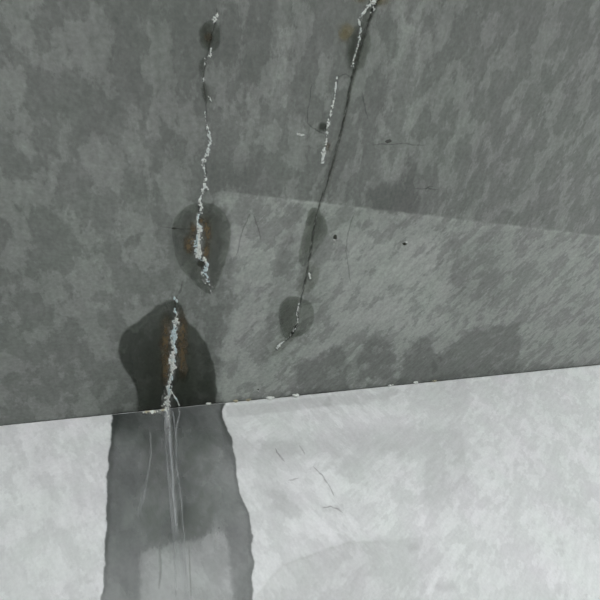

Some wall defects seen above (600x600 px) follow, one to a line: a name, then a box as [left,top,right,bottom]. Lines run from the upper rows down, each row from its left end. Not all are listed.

crack [338,0,377,142]
corrosion [185,218,211,259]
corrosion [160,318,187,385]
damp [105,296,233,557]